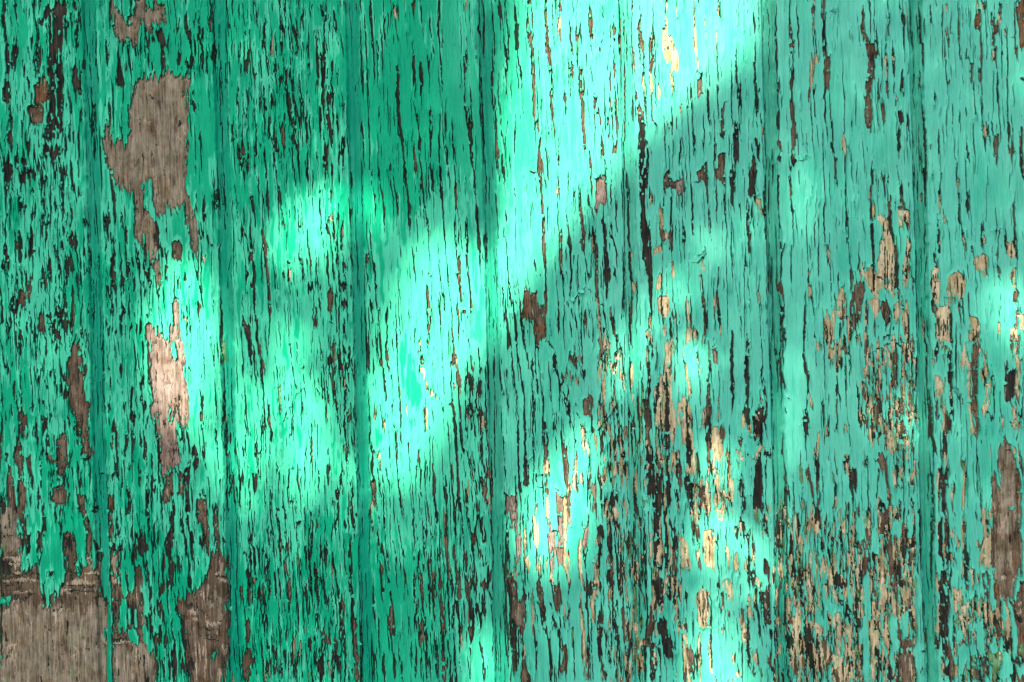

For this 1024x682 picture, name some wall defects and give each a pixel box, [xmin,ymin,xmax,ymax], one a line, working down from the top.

peeling [28,4,63,197]
peeling [0,329,159,682]
peeling [102,0,203,291]
peeling [145,297,200,518]
peeling [175,489,232,682]
peeling [519,286,550,374]
peeling [504,348,633,682]
peeling [592,171,607,216]
peeling [642,4,679,100]
peeling [612,144,768,682]
peeling [776,194,1007,682]
peeling [936,395,1024,682]